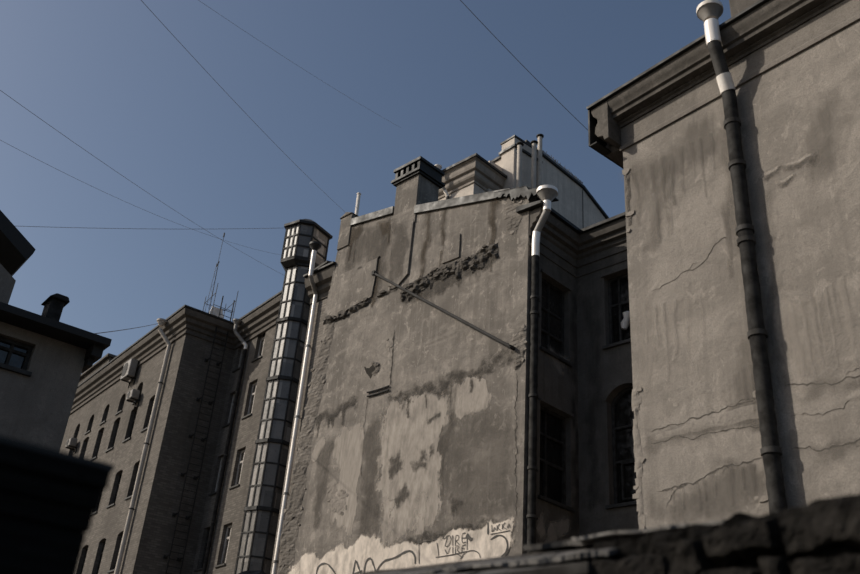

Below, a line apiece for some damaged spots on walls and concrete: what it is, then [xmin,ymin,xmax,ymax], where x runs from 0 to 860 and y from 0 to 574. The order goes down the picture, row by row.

crack [651,237,728,292]
spalling [278,243,499,574]
crack [649,397,759,444]
crack [785,368,860,415]
crack [794,438,860,451]
crack [657,457,763,507]